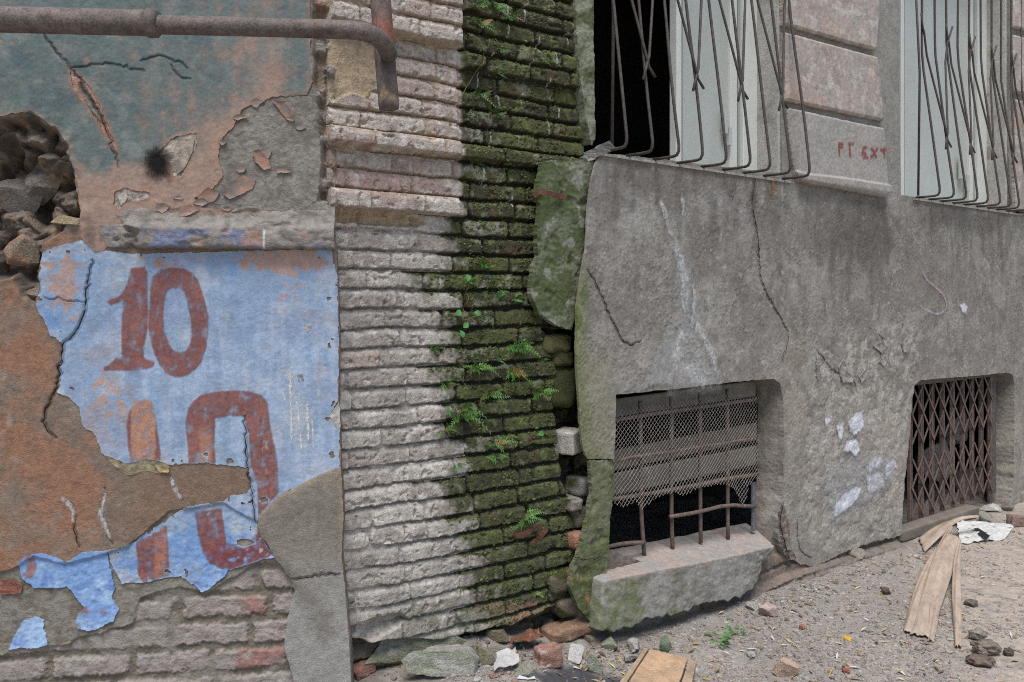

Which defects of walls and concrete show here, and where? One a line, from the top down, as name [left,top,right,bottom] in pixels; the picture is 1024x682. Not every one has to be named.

peeling [71,68,117,150]
crack [44,35,187,165]
spalling [114,95,323,216]
crack [42,261,93,435]
crack [589,273,636,346]
efflorescence [673,245,716,386]
crack [752,179,789,362]
spalling [103,454,170,475]
peeling [0,550,119,631]
peeling [194,567,228,592]
peeling [9,616,48,650]